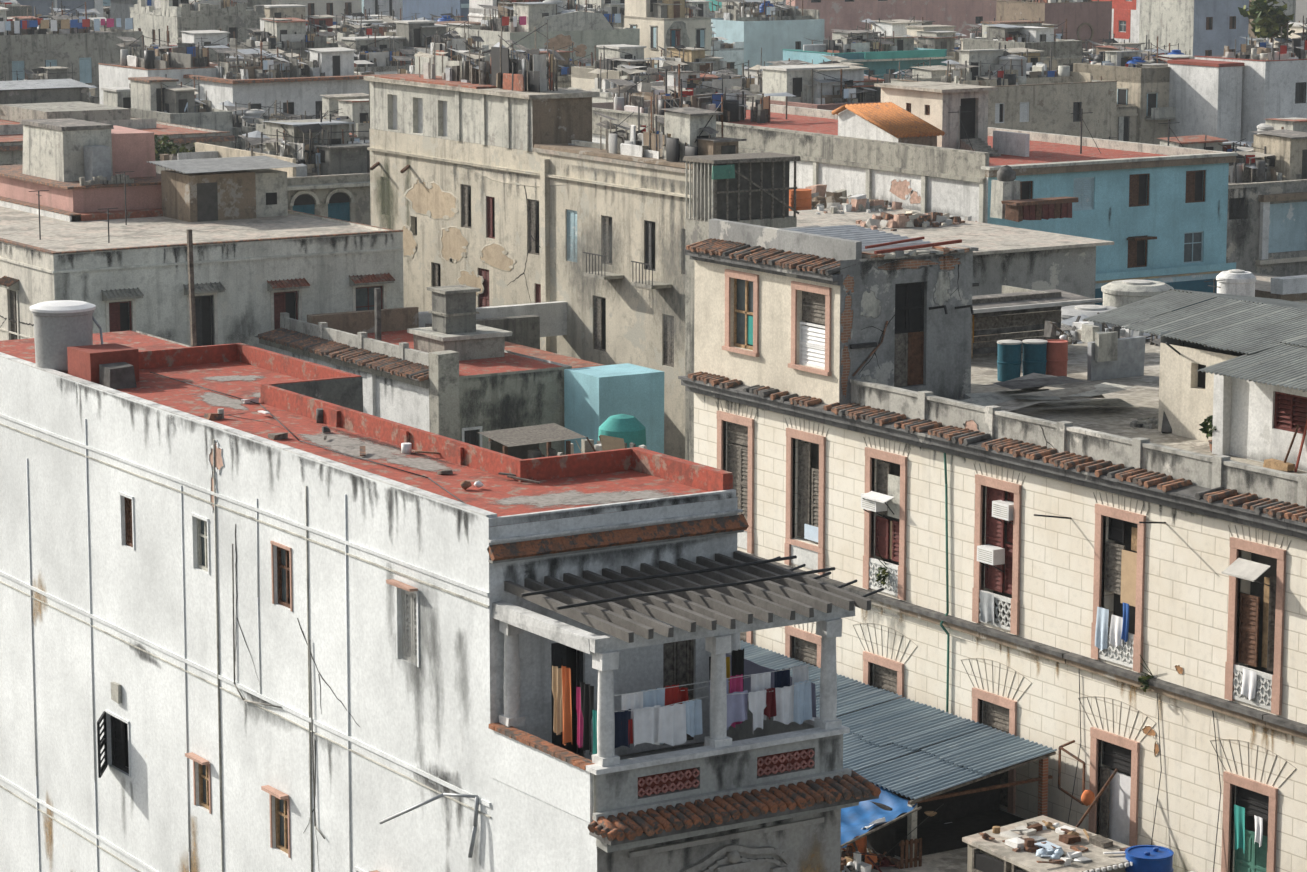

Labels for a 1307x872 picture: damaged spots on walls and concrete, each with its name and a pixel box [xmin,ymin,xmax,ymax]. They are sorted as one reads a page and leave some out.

spalling [889,179,921,204]
flaking render [401,177,517,297]
spalling [840,274,882,402]
water stain [300,458,419,523]
water stain [130,645,155,663]